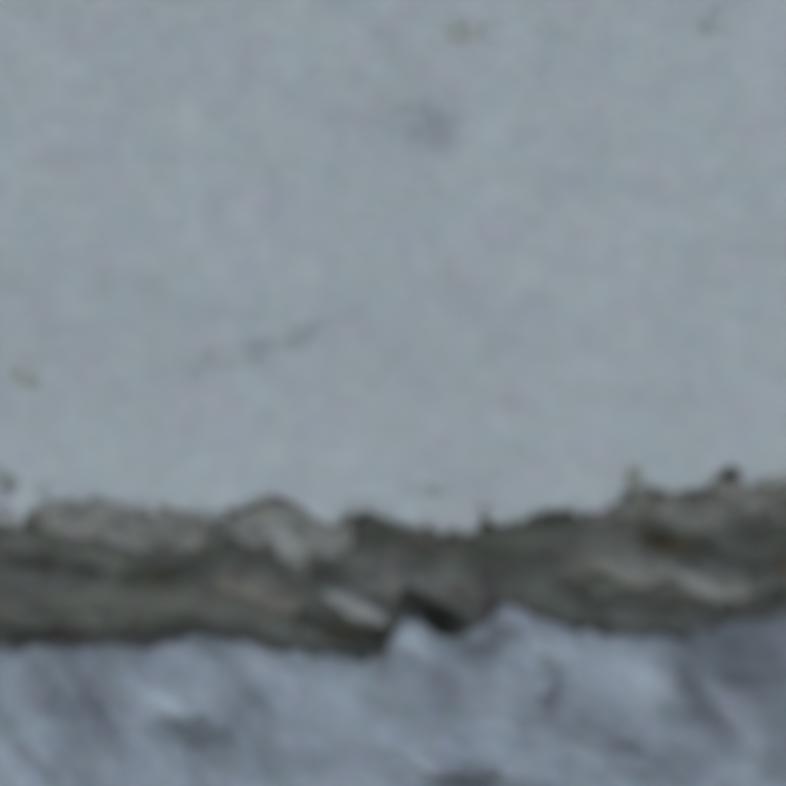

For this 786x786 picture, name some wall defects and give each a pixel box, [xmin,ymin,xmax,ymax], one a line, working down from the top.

spalling [0,495,353,579]
spalling [561,474,786,544]